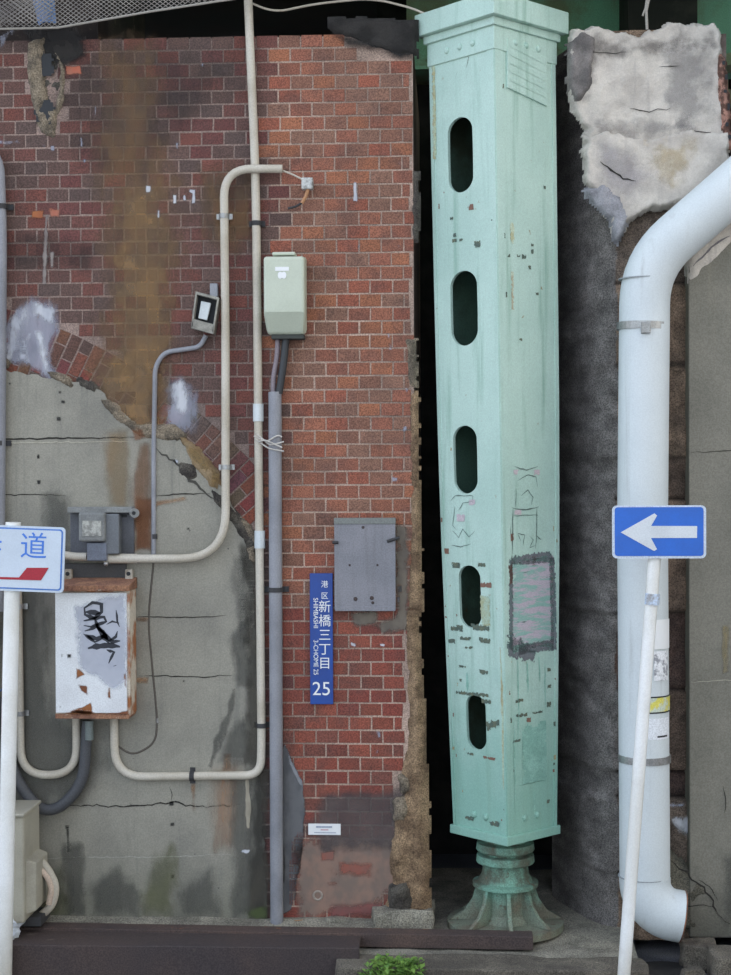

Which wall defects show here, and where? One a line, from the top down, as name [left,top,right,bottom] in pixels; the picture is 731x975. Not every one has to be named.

spalling [27,38,81,138]
leakage [97,175,196,429]
leakage [6,301,57,379]
spalling [47,371,255,562]
peeling [448,623,490,649]
rust [70,669,93,715]
peeling [456,665,491,704]
peeling [516,699,551,722]
crack [70,787,229,808]
crack [671,861,730,924]